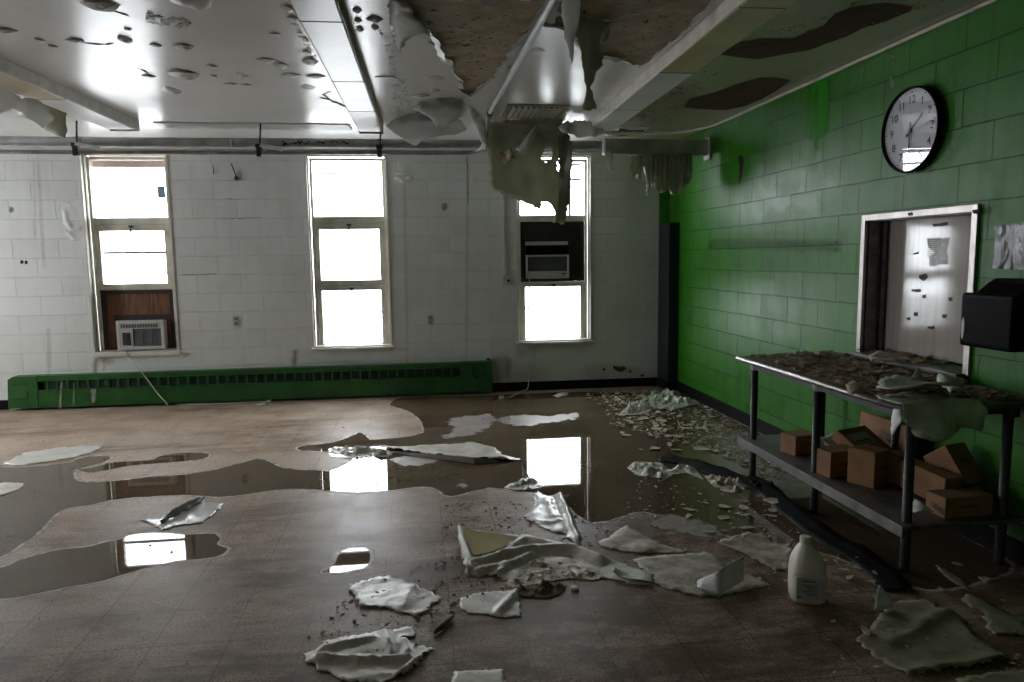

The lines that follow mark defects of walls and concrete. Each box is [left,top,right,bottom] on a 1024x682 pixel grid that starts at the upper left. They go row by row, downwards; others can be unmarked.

peeling [146,13,191,29]
peeling [379,0,580,110]
peeling [580,0,715,69]
peeling [720,0,926,59]
peeling [603,71,790,137]